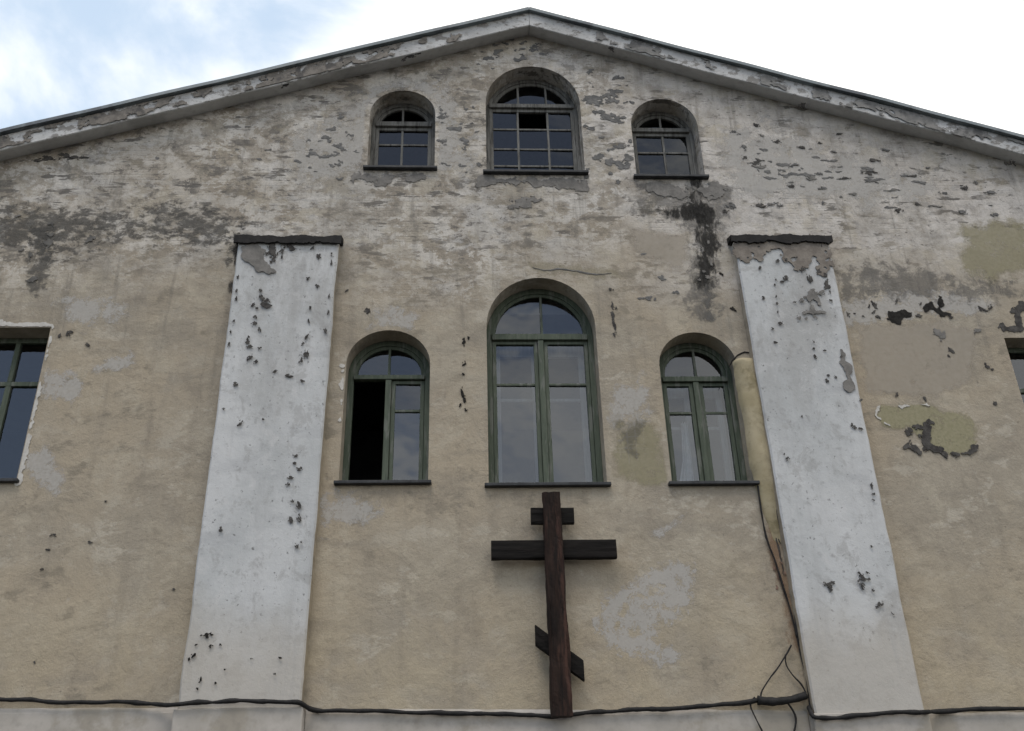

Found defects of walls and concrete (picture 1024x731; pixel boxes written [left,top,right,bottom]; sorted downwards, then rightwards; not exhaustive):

peeling [294,114,427,187]
peeling [436,69,635,211]
peeling [729,123,849,204]
spalling [860,148,948,213]
water stain [0,196,246,296]
peeling [241,243,296,274]
water stain [662,179,721,289]
peeling [732,233,835,344]
spalling [846,296,955,357]
spalling [998,301,1024,332]
peeling [825,349,863,402]
spalling [875,392,979,459]